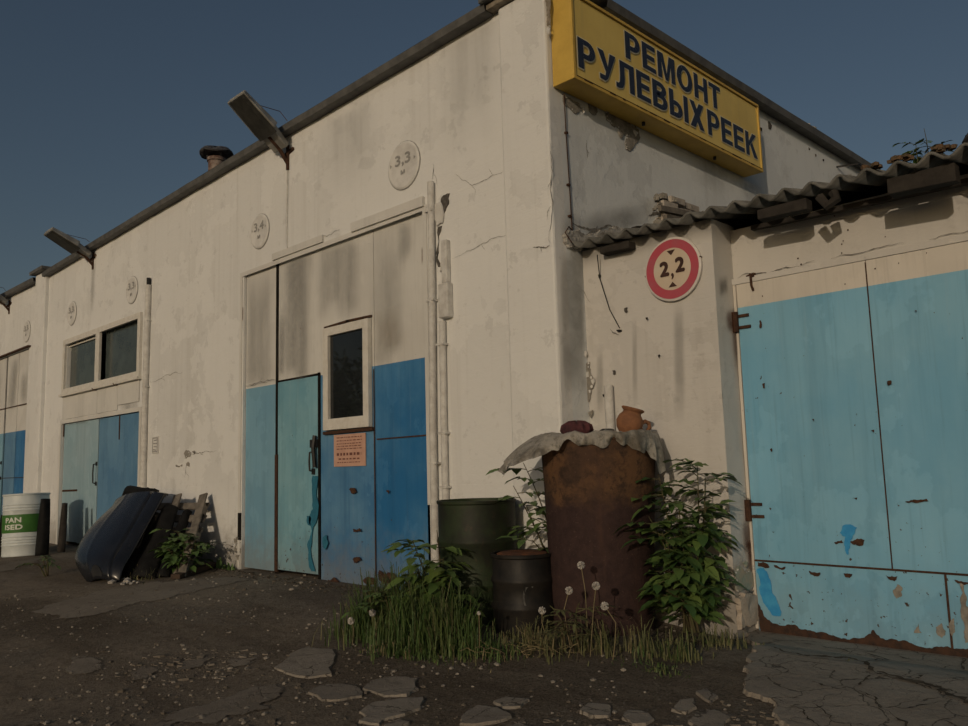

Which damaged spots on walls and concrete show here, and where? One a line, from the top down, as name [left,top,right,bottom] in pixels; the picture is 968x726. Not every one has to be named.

peeling [562,96,641,152]
flaking render [434,193,450,272]
flaking render [705,561,781,632]
rust [758,580,968,658]
rust [887,576,903,598]